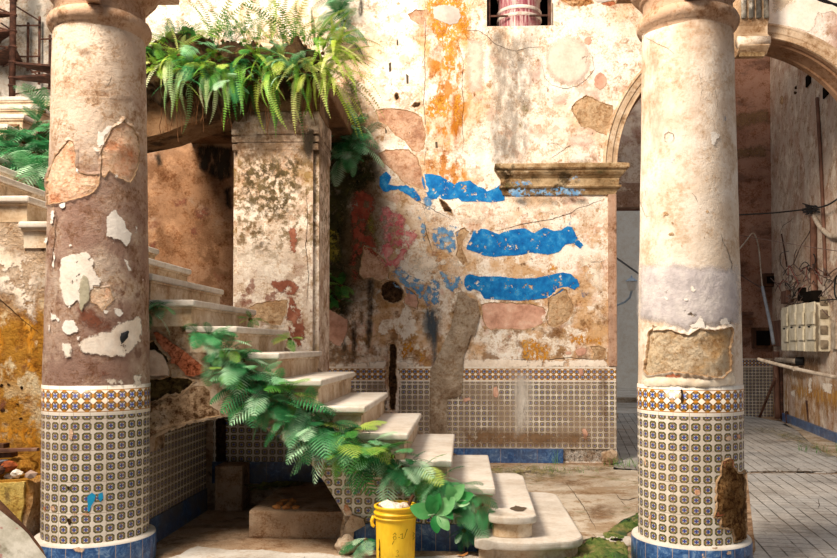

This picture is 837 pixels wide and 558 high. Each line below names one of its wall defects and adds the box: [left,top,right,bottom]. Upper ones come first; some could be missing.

flaking render [44,116,142,224]
flaking render [373,90,429,194]
corrosion [425,0,471,140]
water stain [498,37,527,155]
flaking render [554,91,616,146]
peeling [288,228,298,253]
peeling [413,196,487,270]
flaking render [48,244,227,462]
flaking render [247,279,304,346]
flaking render [478,287,578,338]
flaking render [642,316,736,380]
spalling [713,457,748,555]